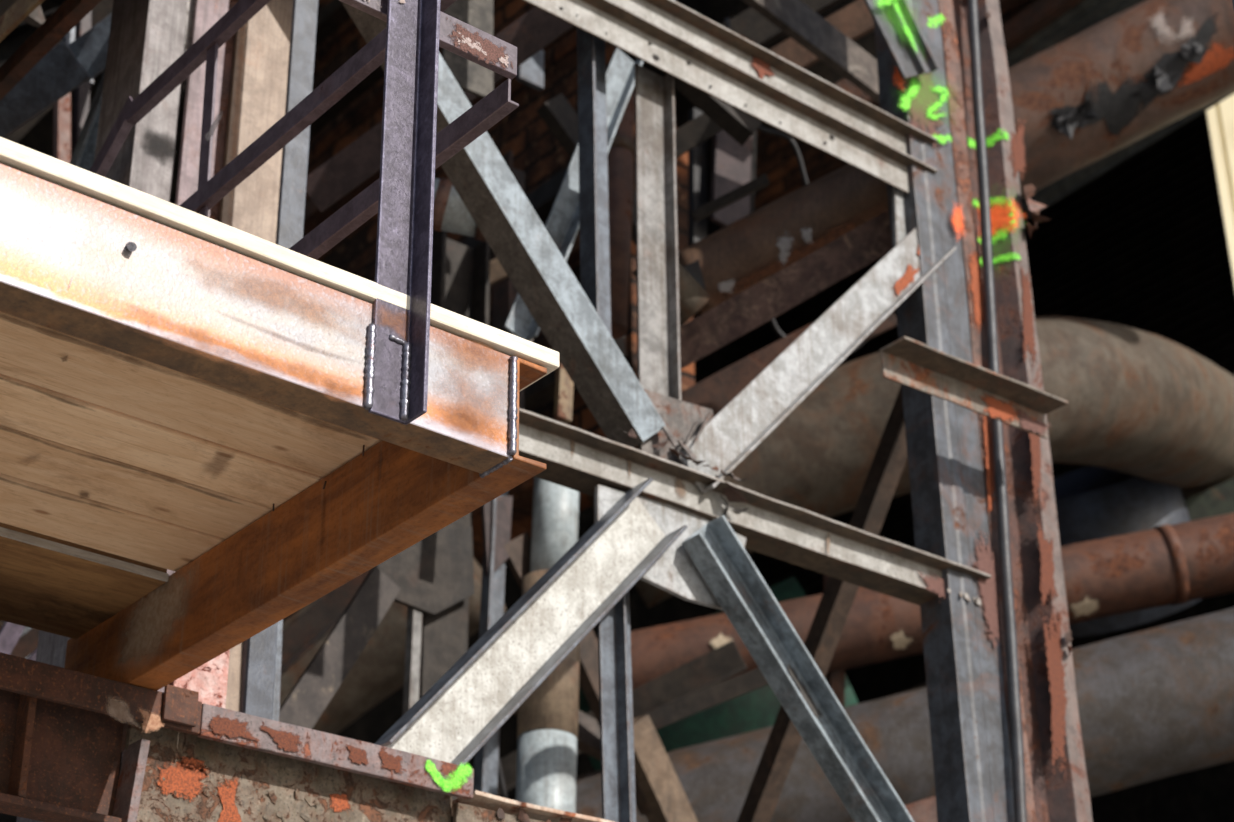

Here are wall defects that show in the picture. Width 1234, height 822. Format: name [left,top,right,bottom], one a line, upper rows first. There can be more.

corrosion [1178,42,1234,86]
corrosion [1011,118,1051,239]
corrosion [887,245,920,295]
corrosion [969,245,985,338]
corrosion [1020,260,1037,371]
corrosion [912,525,1003,652]
corrosion [982,394,1073,780]
peeling [108,699,164,732]
peeling [157,756,242,822]
peeling [209,715,305,758]
peeling [295,785,353,821]
peeling [346,744,404,774]